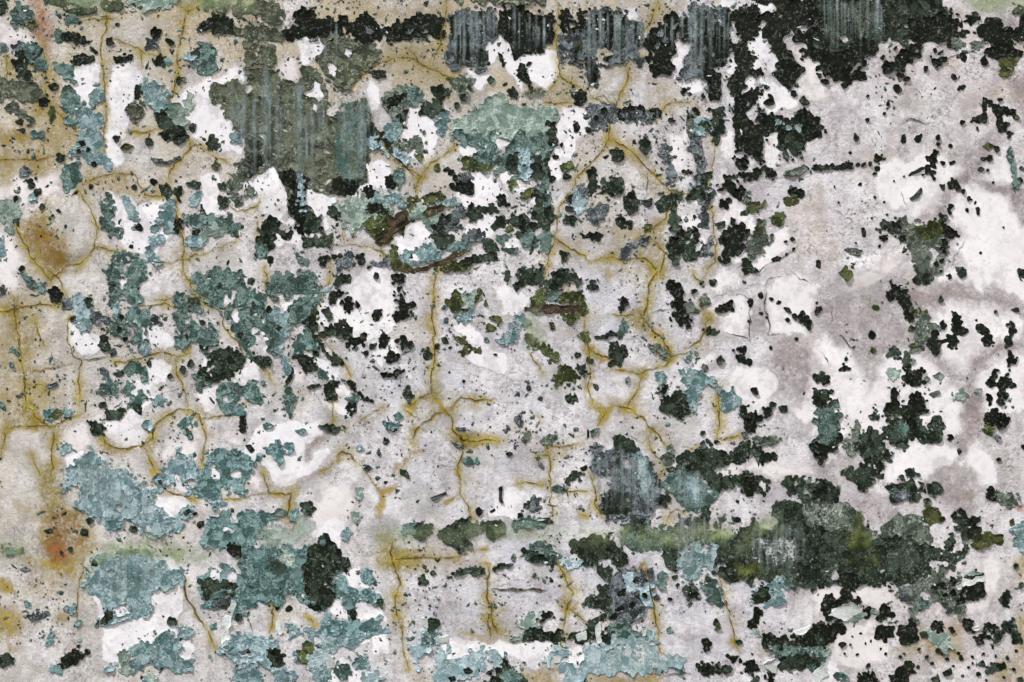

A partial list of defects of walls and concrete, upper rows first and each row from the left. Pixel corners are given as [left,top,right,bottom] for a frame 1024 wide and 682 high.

crack [82,7,196,142]
peeling [960,97,1020,138]
peeling [970,4,1024,77]
crack [0,140,246,476]
crack [409,270,492,516]
peeling [0,0,981,540]
crack [543,4,810,483]
peeling [401,133,1024,682]
peeling [49,547,197,682]
crack [183,574,213,643]
peeling [196,479,394,682]
crack [377,546,587,665]